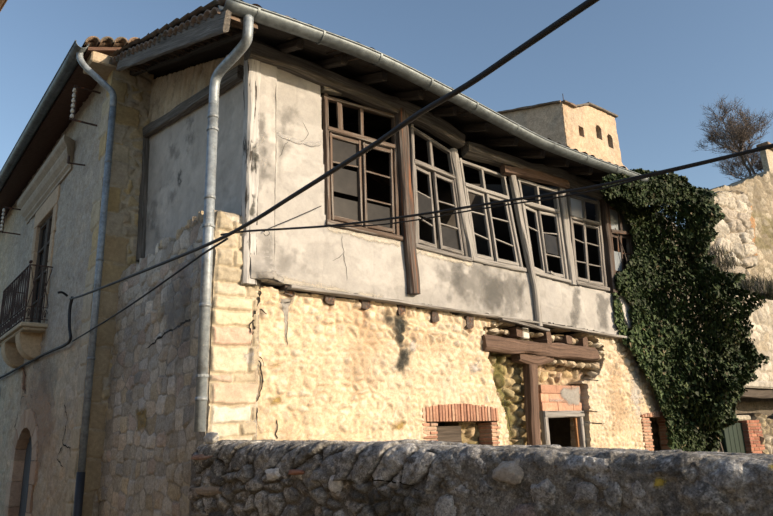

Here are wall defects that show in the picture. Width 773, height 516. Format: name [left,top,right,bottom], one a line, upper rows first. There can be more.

crack [276,120,320,156]
crack [249,286,290,439]
water stain [385,314,415,371]